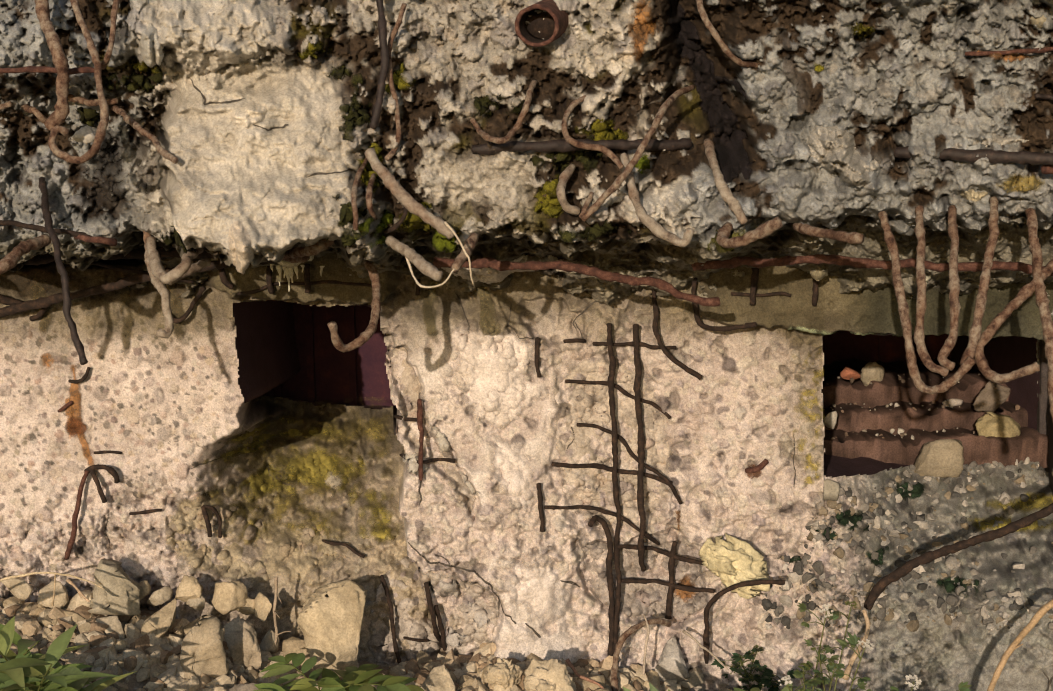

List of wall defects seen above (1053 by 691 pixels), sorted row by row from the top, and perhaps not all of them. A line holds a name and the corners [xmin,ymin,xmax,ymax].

efflorescence [270,256,324,291]
spalling [435,254,646,284]
corrosion [65,365,93,466]
leakage [247,449,392,539]
spalling [553,358,708,626]
peeling [505,562,558,617]
corrosion [674,576,695,600]